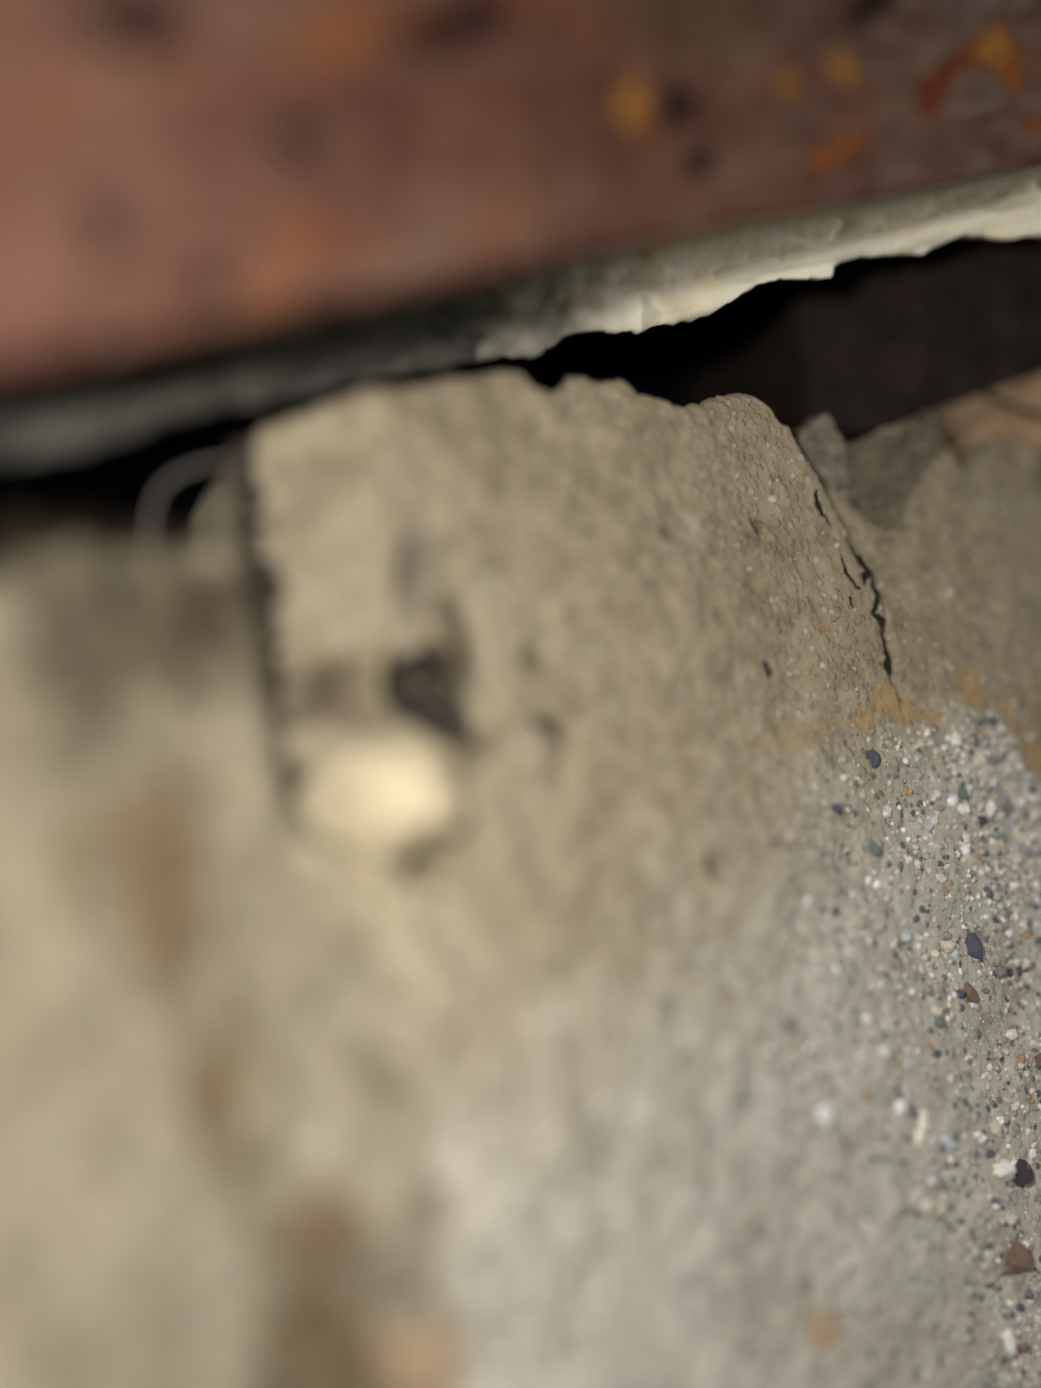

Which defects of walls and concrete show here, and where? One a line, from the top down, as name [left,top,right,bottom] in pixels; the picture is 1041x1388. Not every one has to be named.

rust [78,0,182,57]
rust [619,80,696,129]
rust [919,21,1023,114]
crack [814,489,913,727]